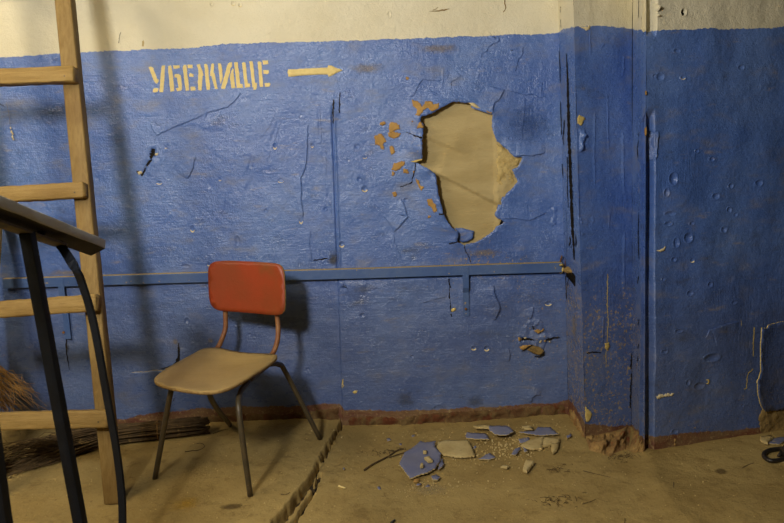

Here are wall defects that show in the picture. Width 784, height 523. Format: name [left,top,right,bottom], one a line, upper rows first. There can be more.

crack [332,93,341,123]
peeling [374,85,547,257]
spalling [517,307,560,357]
peeling [756,321,784,445]
spalling [207,397,651,456]
crack [287,454,328,521]